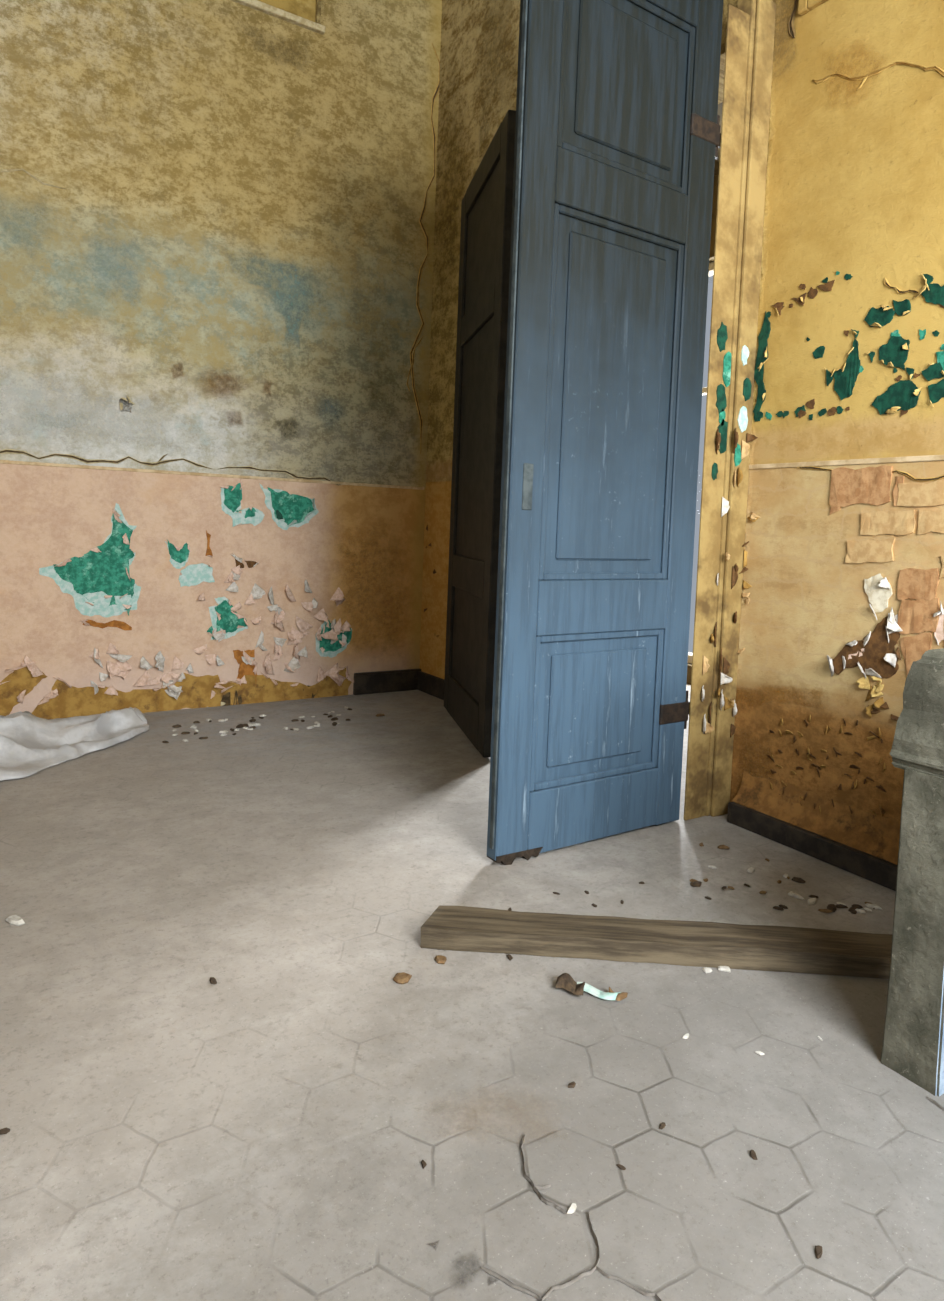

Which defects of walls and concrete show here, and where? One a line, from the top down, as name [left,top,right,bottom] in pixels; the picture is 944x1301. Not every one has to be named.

crack [812,61,944,90]
peeling [711,271,944,517]
peeling [39,503,141,630]
peeling [0,531,354,720]
crack [0,449,366,486]
peeling [219,481,319,530]
peeling [702,622,745,738]
peeling [717,541,752,623]
flaking render [767,465,944,817]
crack [481,1135,661,1301]